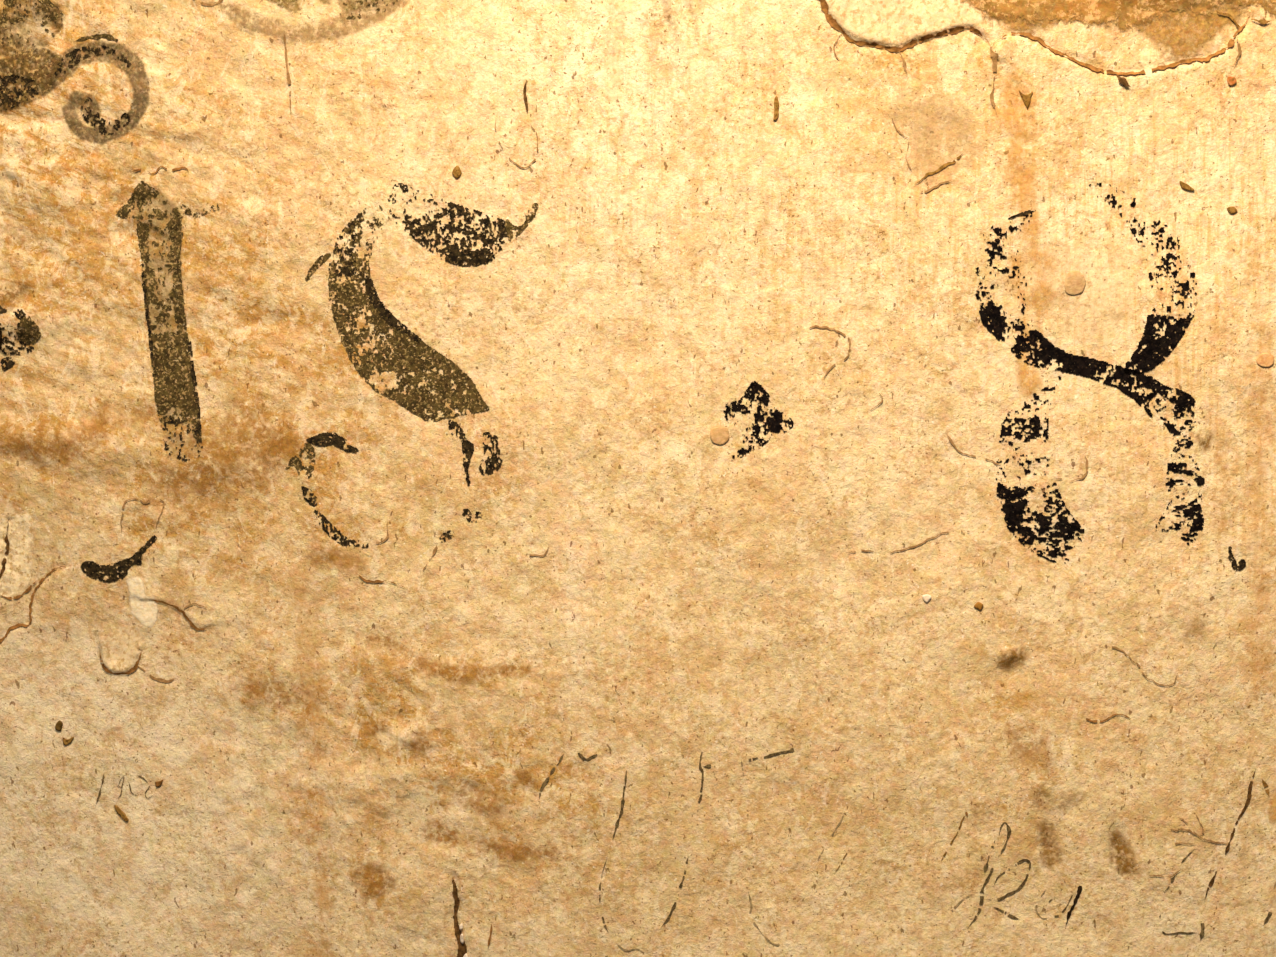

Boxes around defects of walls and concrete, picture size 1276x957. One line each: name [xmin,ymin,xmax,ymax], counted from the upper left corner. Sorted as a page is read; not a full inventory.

peeling [826,0,986,45]
crack [820,0,1272,114]
crack [0,523,70,643]